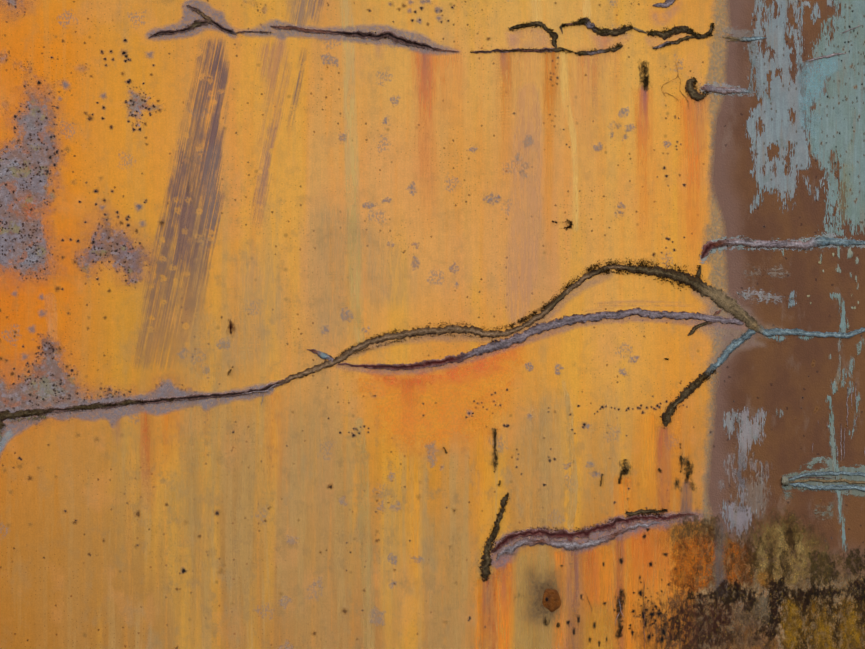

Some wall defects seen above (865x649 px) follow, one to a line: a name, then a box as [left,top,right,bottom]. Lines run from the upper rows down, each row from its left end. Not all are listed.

crack [146,0,766,108]
spalling [93,177,147,233]
peeling [737,0,865,472]
crack [0,232,865,455]
crack [781,456,865,498]
crack [478,492,703,582]